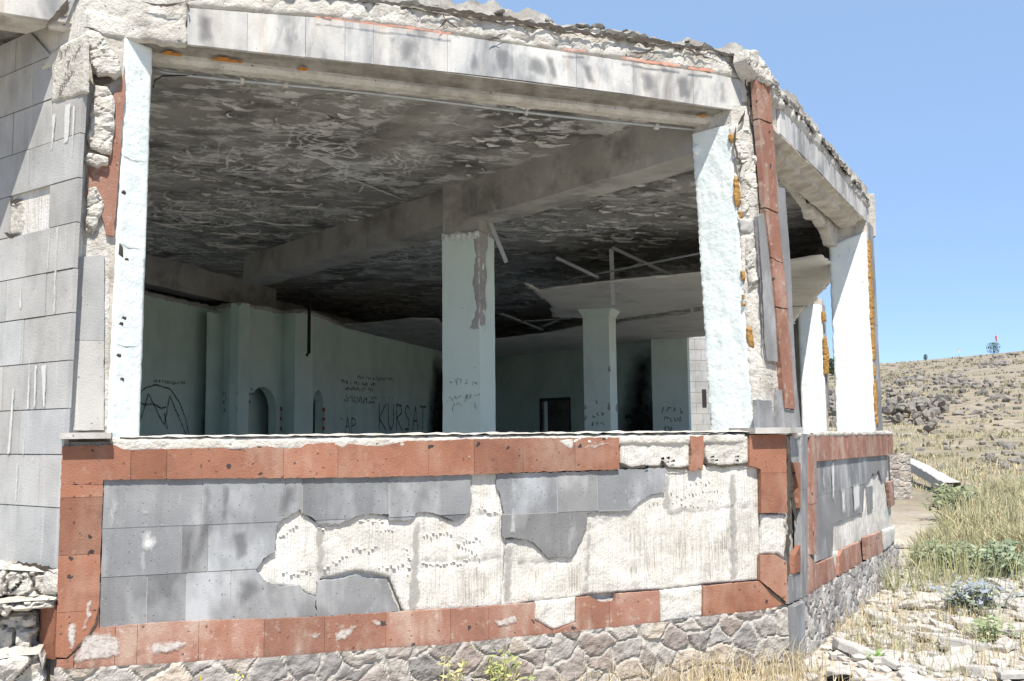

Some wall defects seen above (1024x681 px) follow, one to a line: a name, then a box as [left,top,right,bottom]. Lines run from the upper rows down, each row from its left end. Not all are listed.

spalling [41,30,135,169]
spalling [733,50,774,87]
spalling [85,187,104,234]
peeling [148,84,387,253]
spalling [441,229,489,330]
spalling [256,435,787,630]
spalling [818,473,895,577]